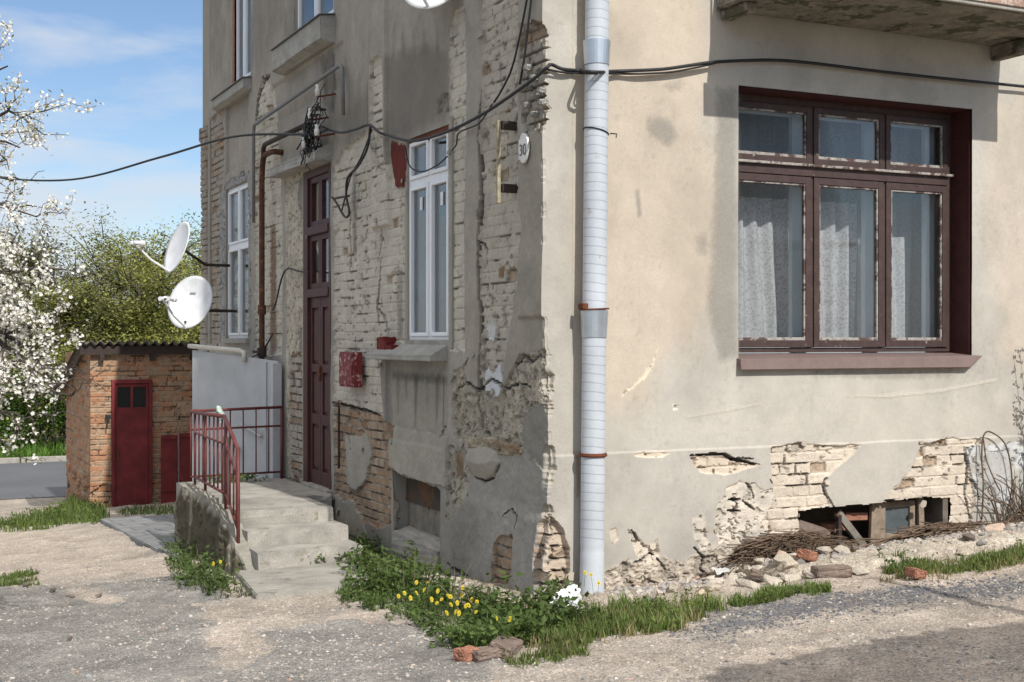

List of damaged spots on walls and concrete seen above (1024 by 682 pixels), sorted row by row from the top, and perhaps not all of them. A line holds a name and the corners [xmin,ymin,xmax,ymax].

crack [349,211,389,332]
spalling [332,55,407,529]
spalling [436,0,557,522]
crack [458,89,542,427]
spalling [487,533,513,586]
spalling [532,504,574,594]
spalling [604,440,861,590]
spalling [883,437,1024,529]